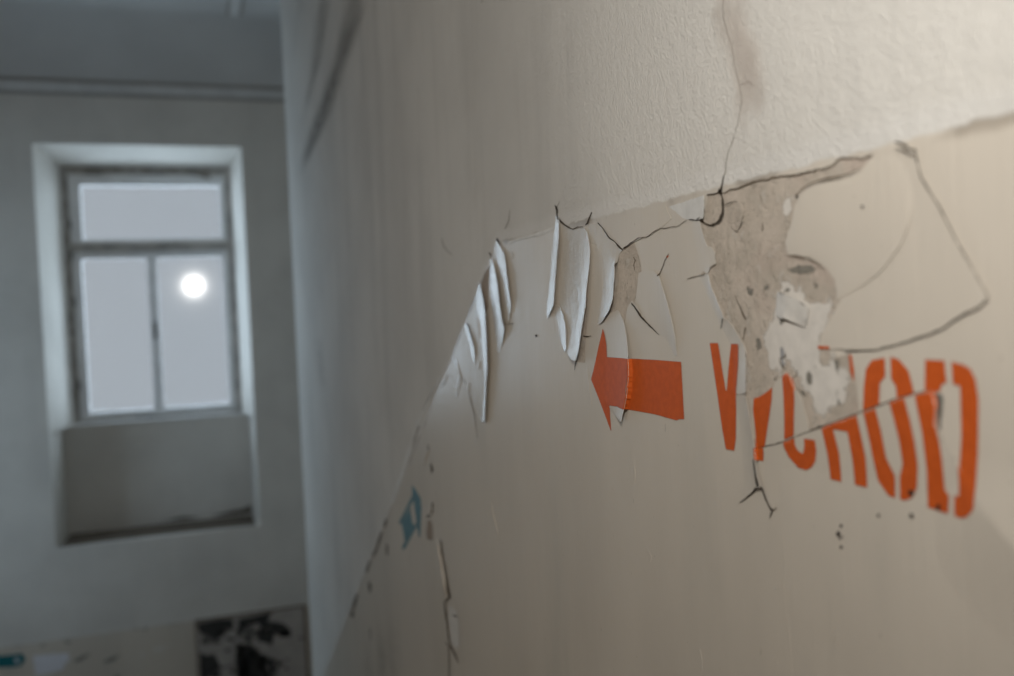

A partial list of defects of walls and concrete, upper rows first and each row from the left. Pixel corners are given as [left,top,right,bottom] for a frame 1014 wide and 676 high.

crack [689,0,754,226]
flaking render [441,155,873,501]
crack [426,501,460,670]
crack [739,389,930,676]